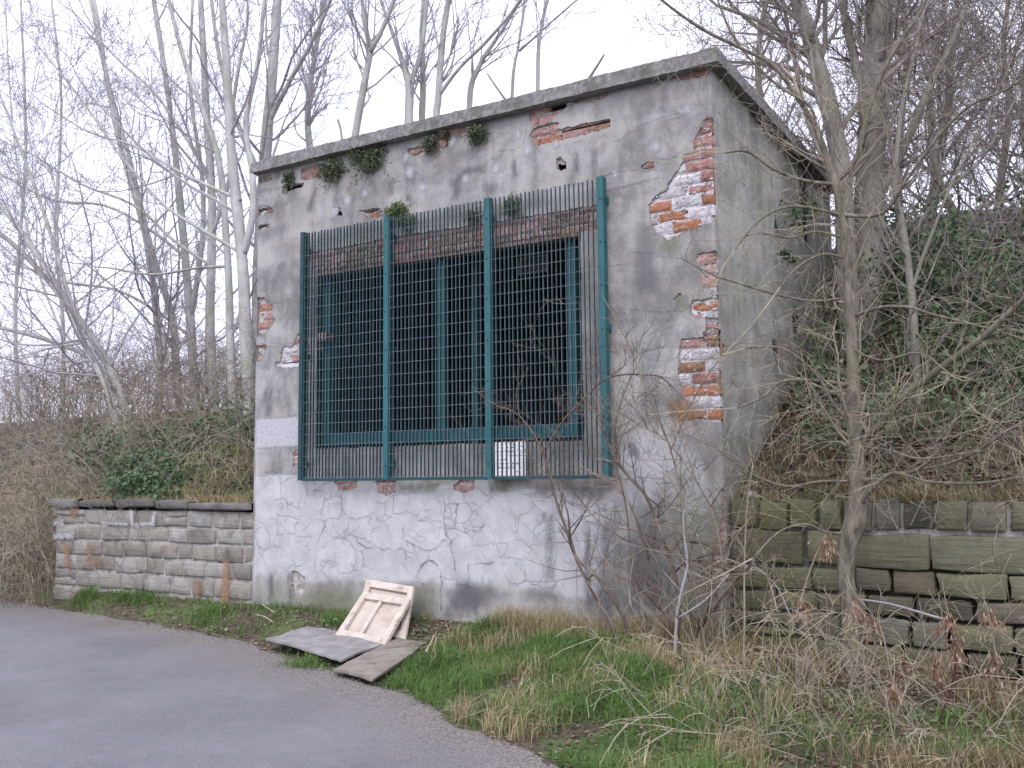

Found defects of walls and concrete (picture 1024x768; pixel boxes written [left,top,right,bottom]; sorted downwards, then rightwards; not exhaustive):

spalling [529,93,611,146]
spalling [648,117,716,241]
spalling [257,297,275,361]
spalling [275,333,333,368]
spalling [674,250,727,423]
spalling [334,481,357,491]
spalling [375,480,397,496]
spalling [453,480,475,493]
spalling [291,571,306,599]